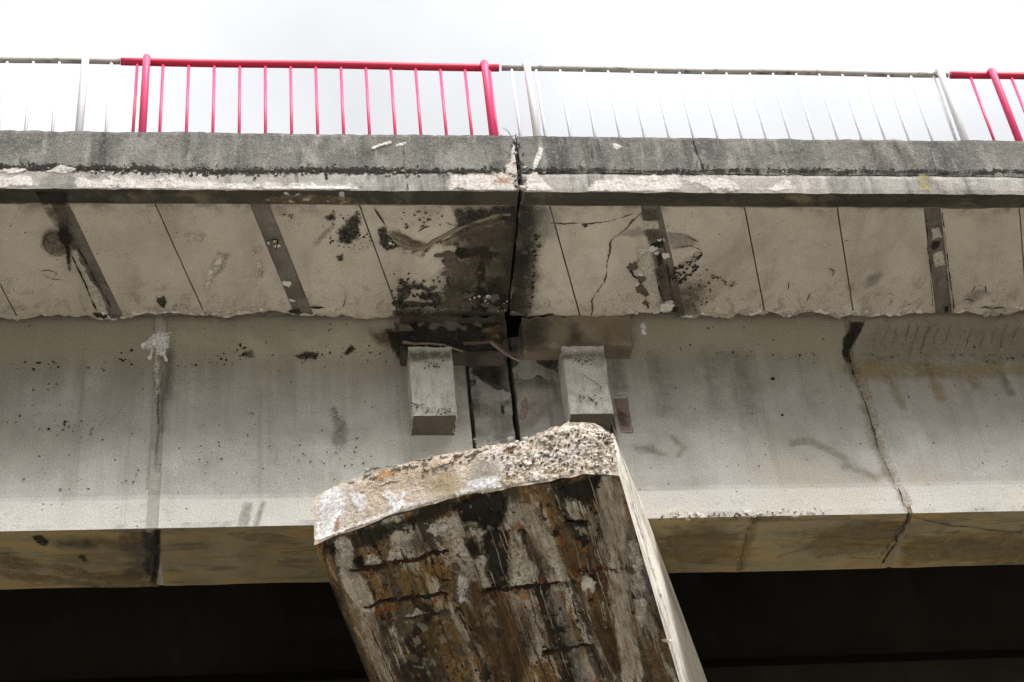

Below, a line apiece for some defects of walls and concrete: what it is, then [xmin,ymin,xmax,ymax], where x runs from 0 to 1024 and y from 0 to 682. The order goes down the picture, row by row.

water stain [36,192,75,271]
water stain [284,185,397,261]
water stain [391,205,559,394]
crack [847,354,1024,565]
spalling [265,428,617,682]